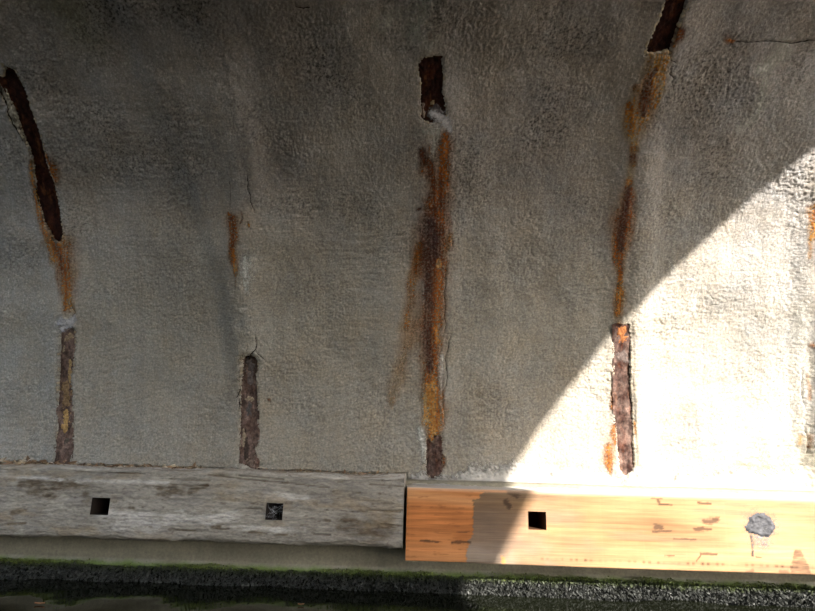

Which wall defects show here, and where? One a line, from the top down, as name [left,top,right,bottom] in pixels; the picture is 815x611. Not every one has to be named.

spalling [0,63,64,241]
rust [28,161,75,312]
rust [227,212,250,285]
rust [398,130,454,441]
spalling [418,56,448,126]
rust [612,26,686,324]
spalling [644,0,689,56]
rust [604,424,616,475]